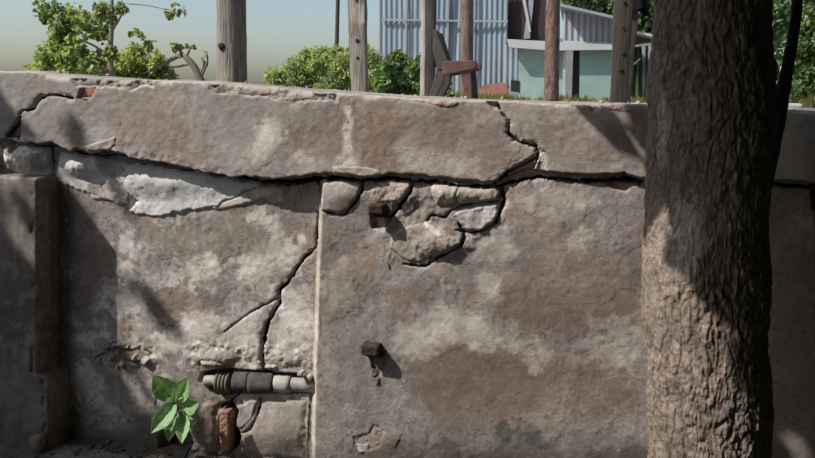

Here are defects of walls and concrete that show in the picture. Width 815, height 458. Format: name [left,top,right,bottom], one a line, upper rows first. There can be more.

crack [9,95,90,138]
corrosion [77,82,208,172]
crack [39,145,138,173]
peeling [0,126,284,217]
peeling [321,166,413,213]
peeling [431,179,500,231]
spalling [510,149,545,182]
crack [158,105,645,366]
peeling [375,215,460,262]
spalling [96,342,151,369]